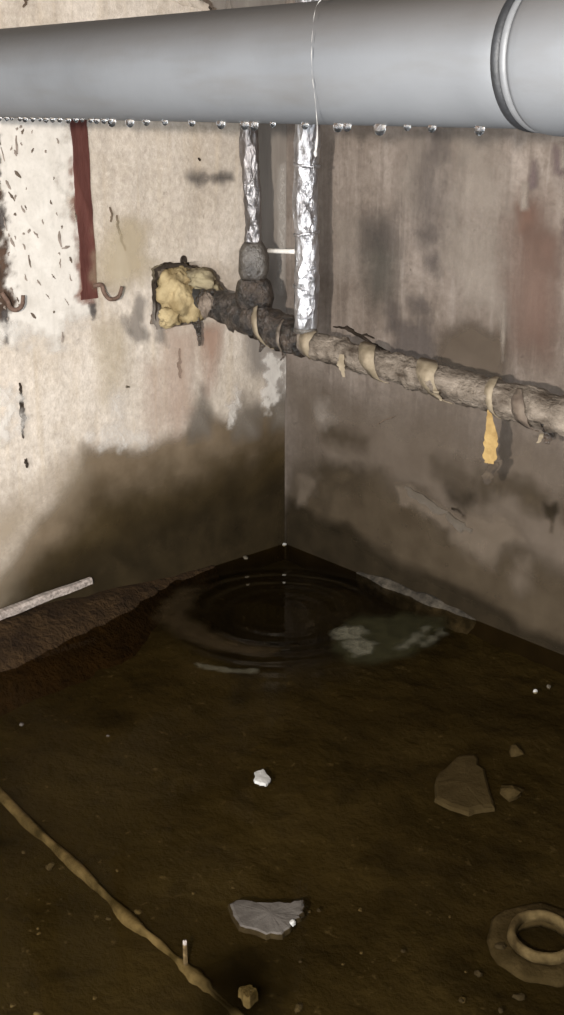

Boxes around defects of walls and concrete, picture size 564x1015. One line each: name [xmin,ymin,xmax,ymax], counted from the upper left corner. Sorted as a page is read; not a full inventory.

water stain [258,123,286,313]
water stain [388,306,507,380]
water stain [0,336,564,655]